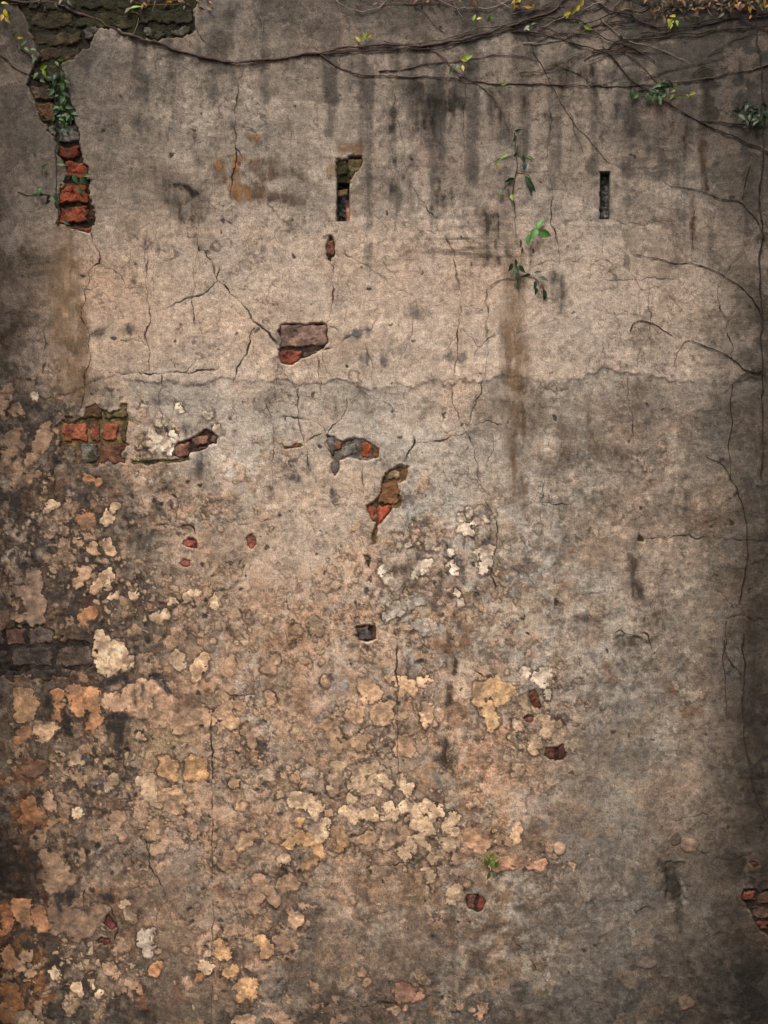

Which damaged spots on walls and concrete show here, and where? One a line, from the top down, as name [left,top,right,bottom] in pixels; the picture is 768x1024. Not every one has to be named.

flaking render [18,0,198,233]
damp [415,81,464,131]
damp [162,176,206,224]
damp [249,159,305,206]
damp [482,210,510,263]
crack [539,181,578,265]
crack [81,232,148,406]
crack [121,243,376,488]
flaking render [278,323,328,365]
crack [406,183,499,586]
flaking render [4,391,223,488]
peeling [356,465,465,642]